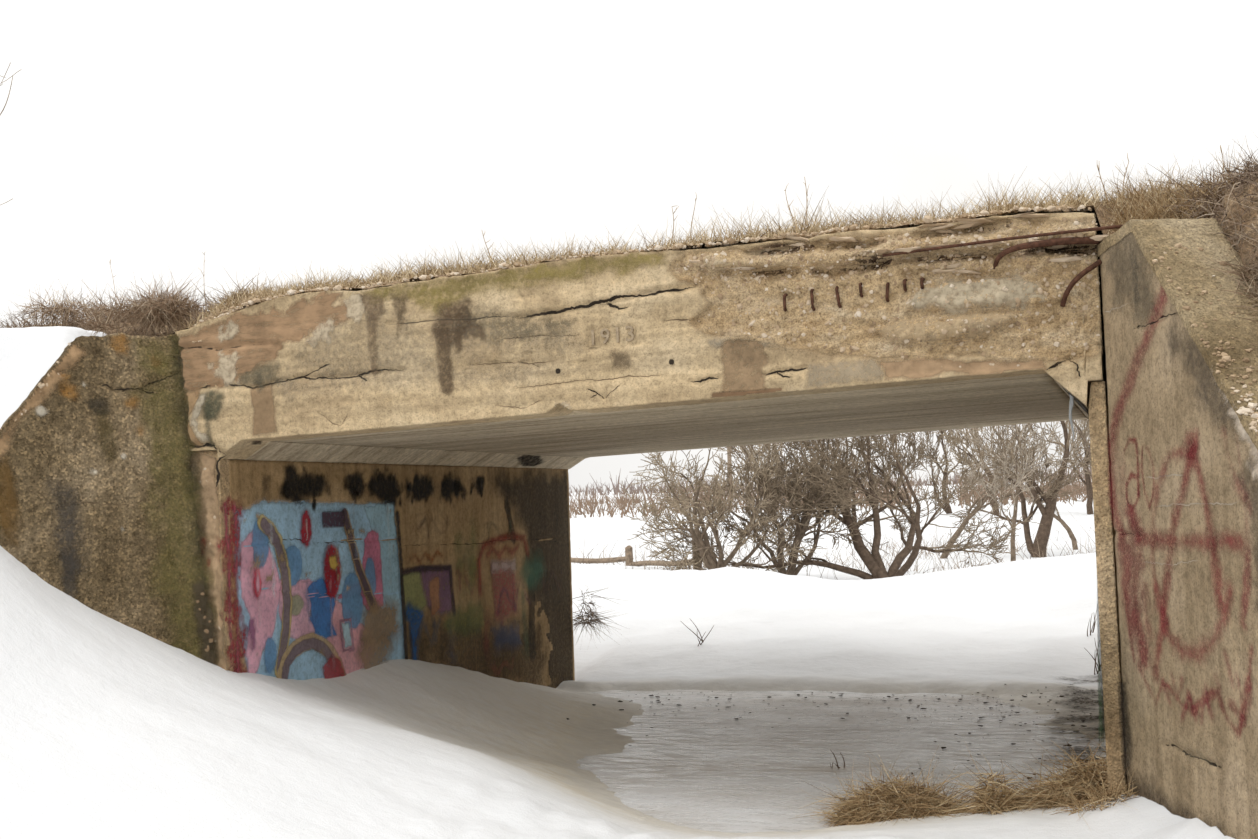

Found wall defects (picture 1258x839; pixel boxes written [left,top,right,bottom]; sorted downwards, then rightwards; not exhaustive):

crack [102,344,401,394]
damp [432,299,484,393]
crack [397,287,698,409]
spalling [669,212,1108,397]